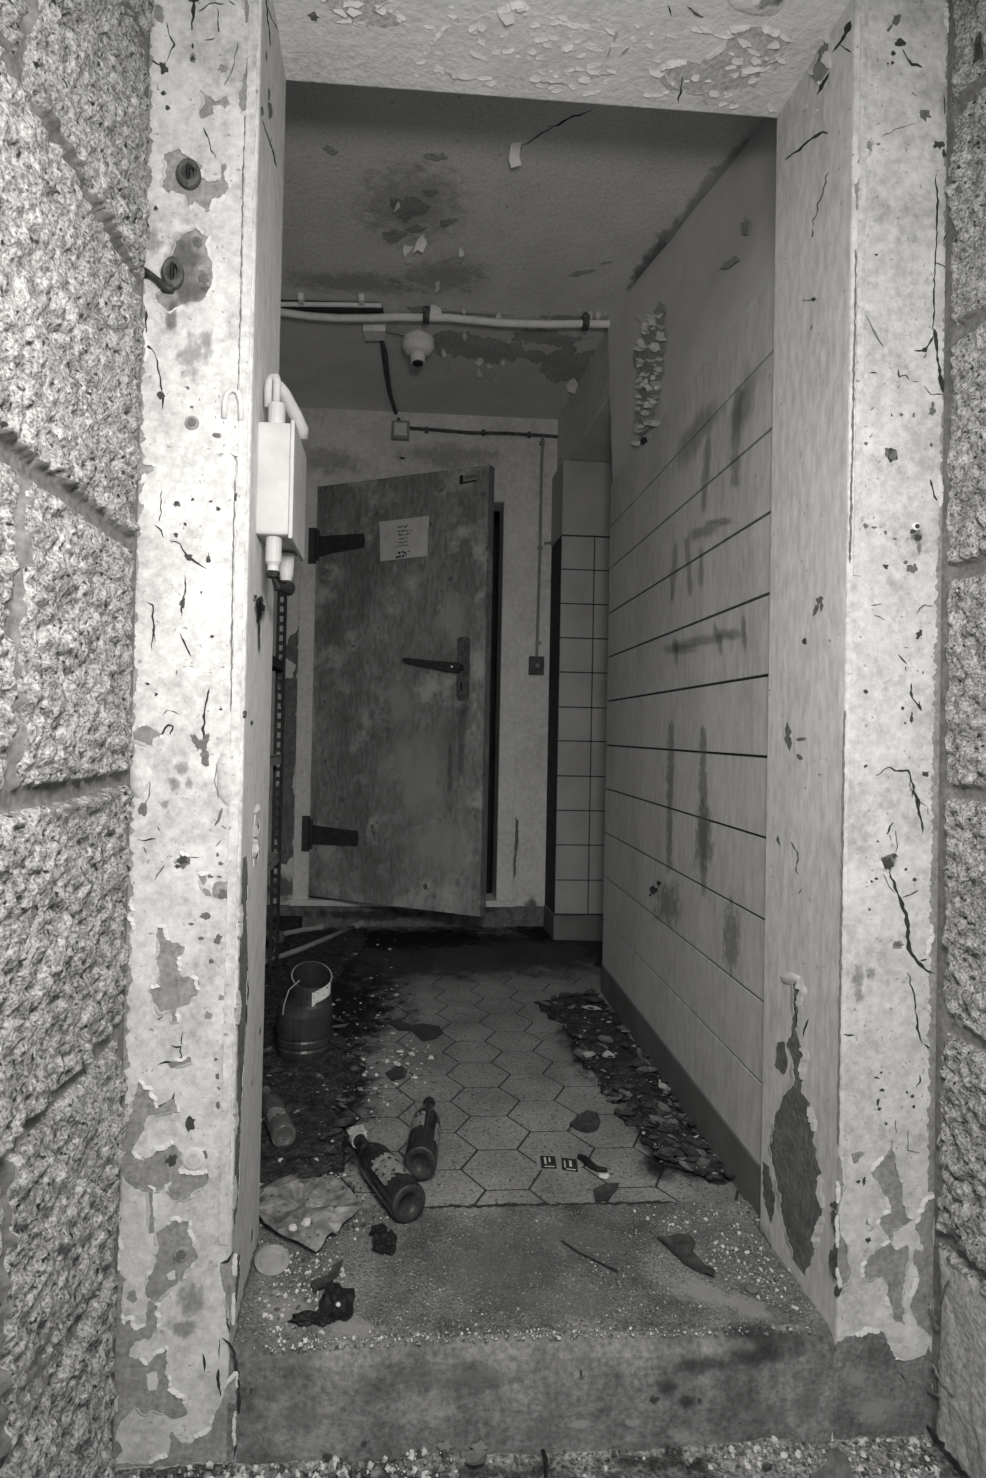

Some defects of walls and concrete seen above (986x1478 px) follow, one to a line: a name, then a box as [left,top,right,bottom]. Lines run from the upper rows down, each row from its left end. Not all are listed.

crack [188,0,279,85]
peeling [307,0,406,28]
peeling [644,24,795,113]
crack [203,116,277,390]
peeling [631,301,666,446]
crack [849,176,946,563]
crack [148,480,236,740]
peeling [127,899,136,934]
crack [776,835,802,894]
crack [794,711,933,1144]
peeling [113,1079,253,1471]
peeling [762,977,935,1442]